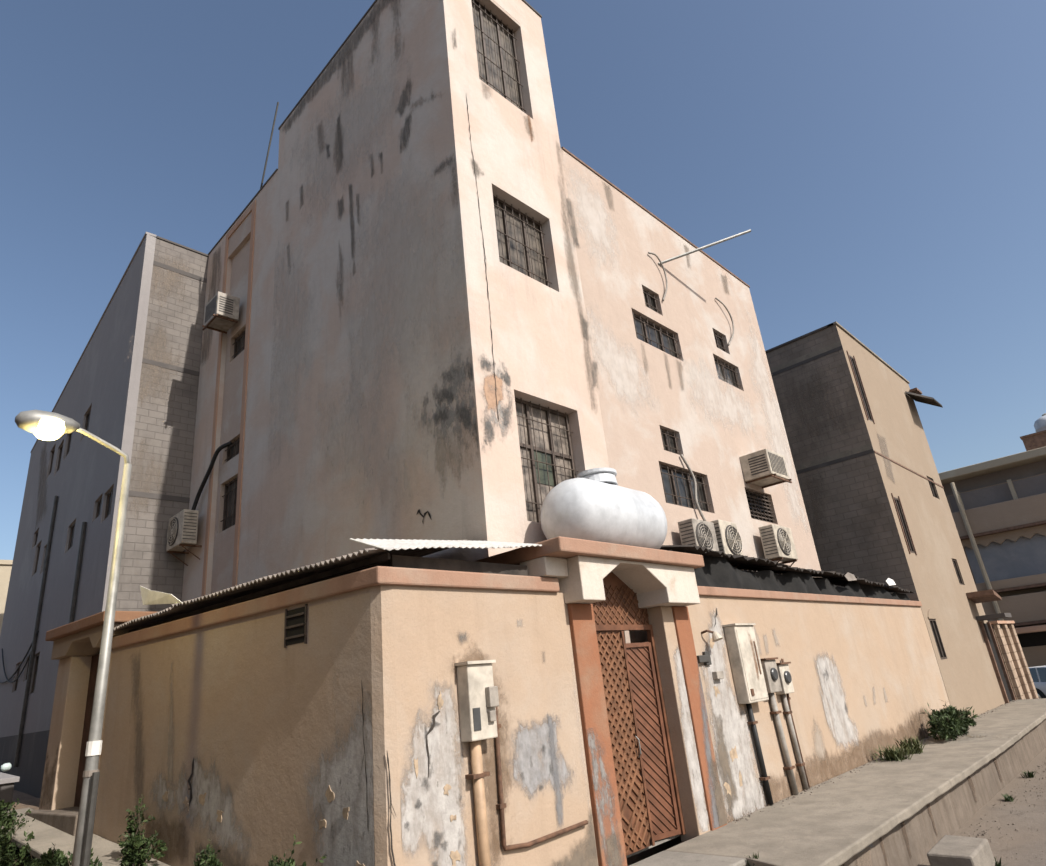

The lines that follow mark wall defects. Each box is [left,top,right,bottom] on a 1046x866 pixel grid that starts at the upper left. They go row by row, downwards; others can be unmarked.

leakage [319,116,342,171]
leakage [397,82,412,149]
leakage [338,185,359,278]
leakage [421,359,511,443]
crack [187,757,195,806]
peeling [307,702,375,866]
crack [426,711,440,778]
peeling [401,687,466,866]
peeling [513,716,570,824]
peeling [702,616,765,819]
peeling [815,655,857,761]